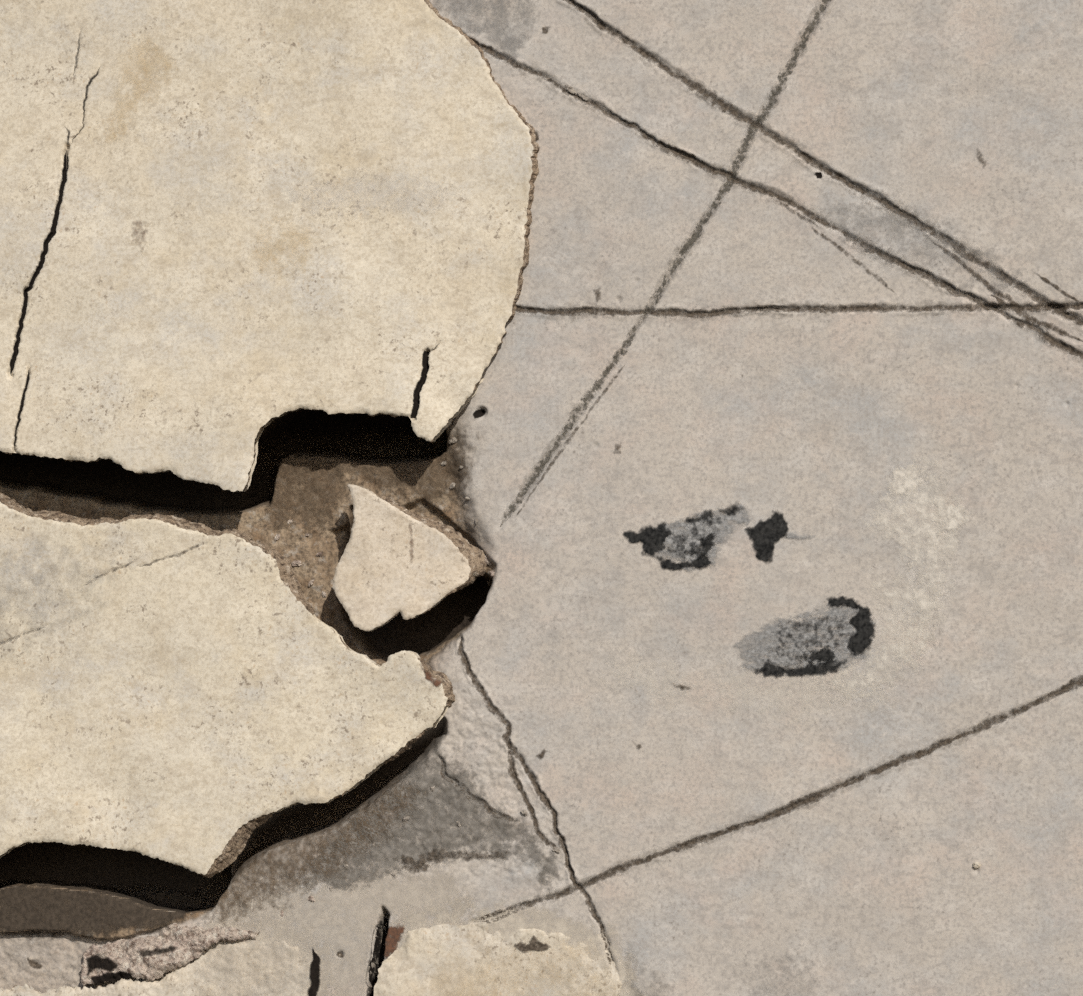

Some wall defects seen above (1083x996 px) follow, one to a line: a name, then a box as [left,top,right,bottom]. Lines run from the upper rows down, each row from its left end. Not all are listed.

crack [10,47,99,450]
spalling [424,0,540,442]
crack [411,346,437,418]
spalling [0,493,315,615]
damp [623,505,810,571]
damp [739,461,968,695]
spalling [290,658,455,806]
spalling [178,812,273,878]
crack [439,638,616,967]
spalling [71,923,260,989]
spalling [515,936,549,952]